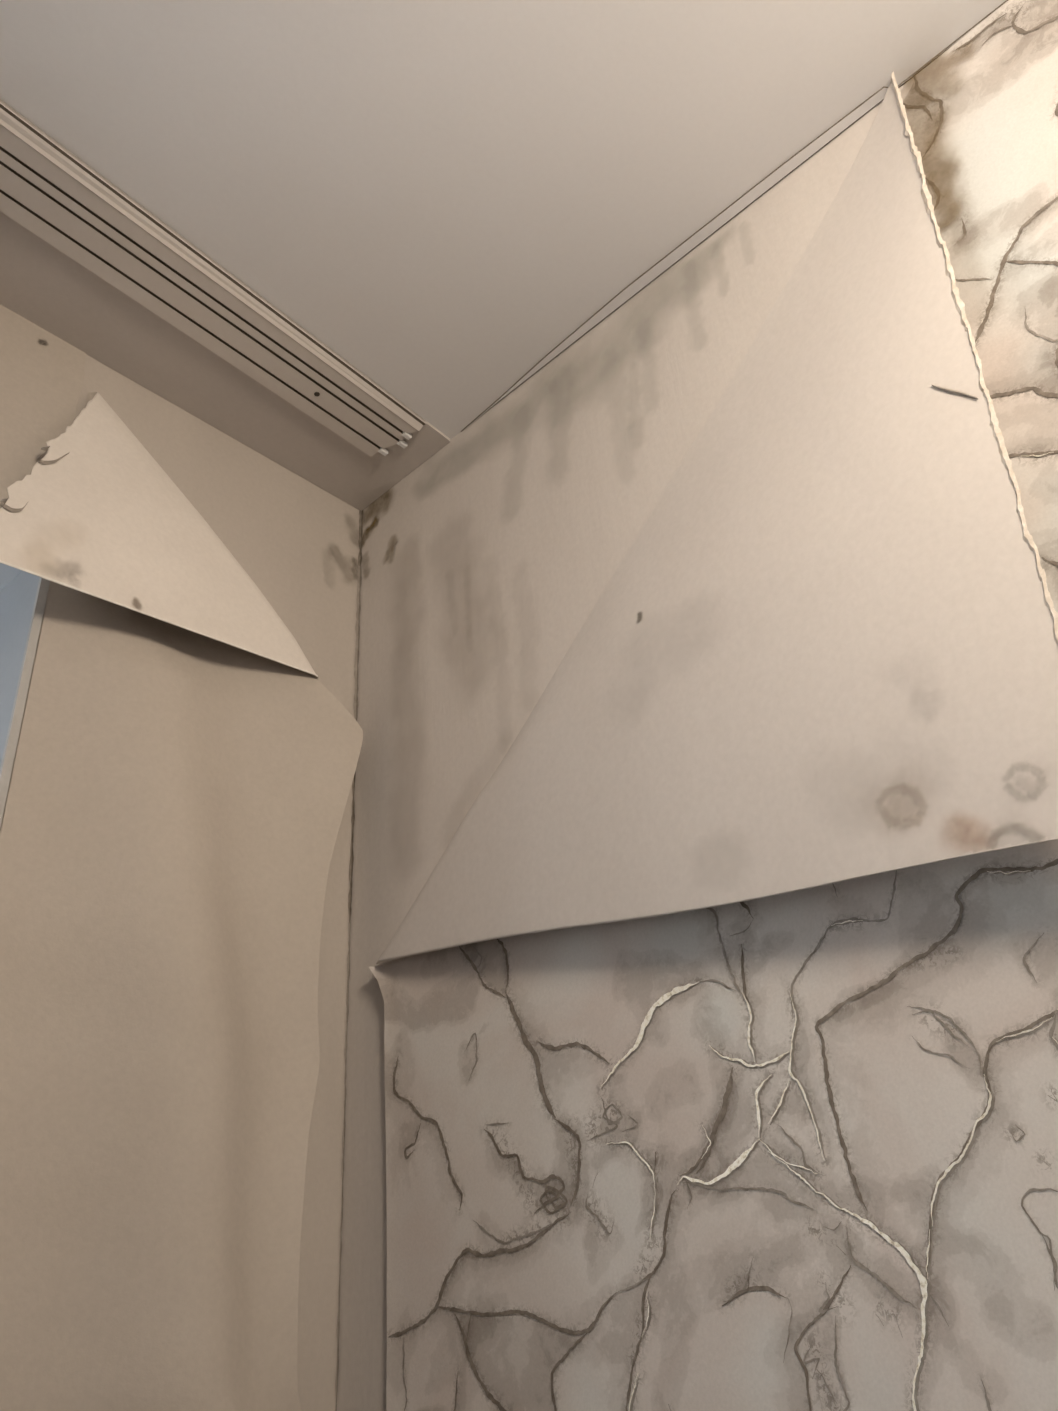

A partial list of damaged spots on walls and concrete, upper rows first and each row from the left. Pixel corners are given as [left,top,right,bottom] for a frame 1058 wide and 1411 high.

peeling [0,392,318,678]
peeling [376,71,1058,964]